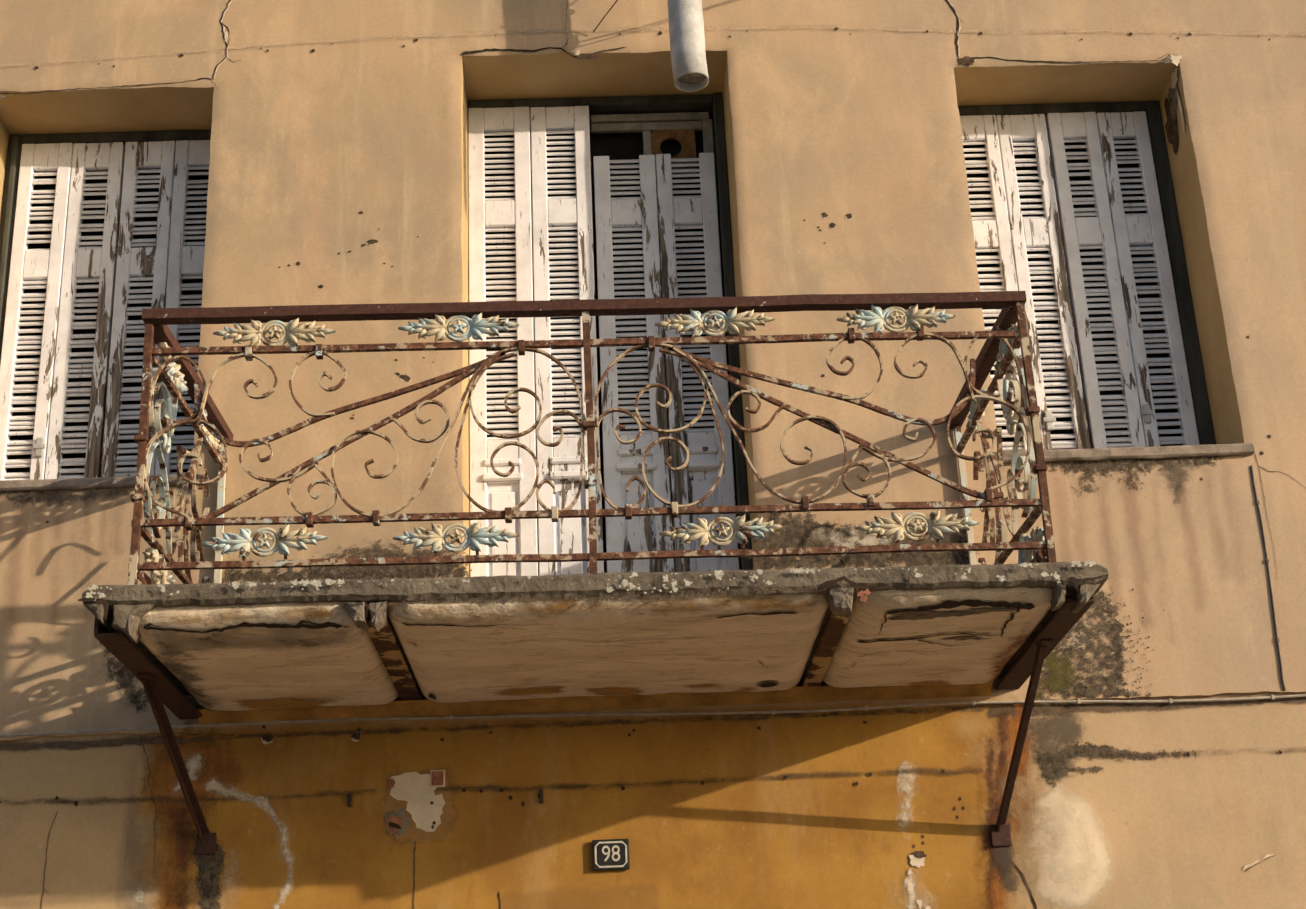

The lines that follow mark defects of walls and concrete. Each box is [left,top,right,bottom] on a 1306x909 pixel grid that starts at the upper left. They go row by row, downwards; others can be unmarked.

crack [0,0,240,94]
crack [946,0,1174,65]
crack [1254,452,1306,570]
crack [78,598,109,621]
crack [144,596,384,679]
crack [402,612,798,668]
crack [818,576,1035,669]
water stain [995,586,1196,890]
water stain [39,779,292,909]
corrosion [144,724,238,909]
spalling [383,769,457,842]
corrosion [980,703,1030,909]